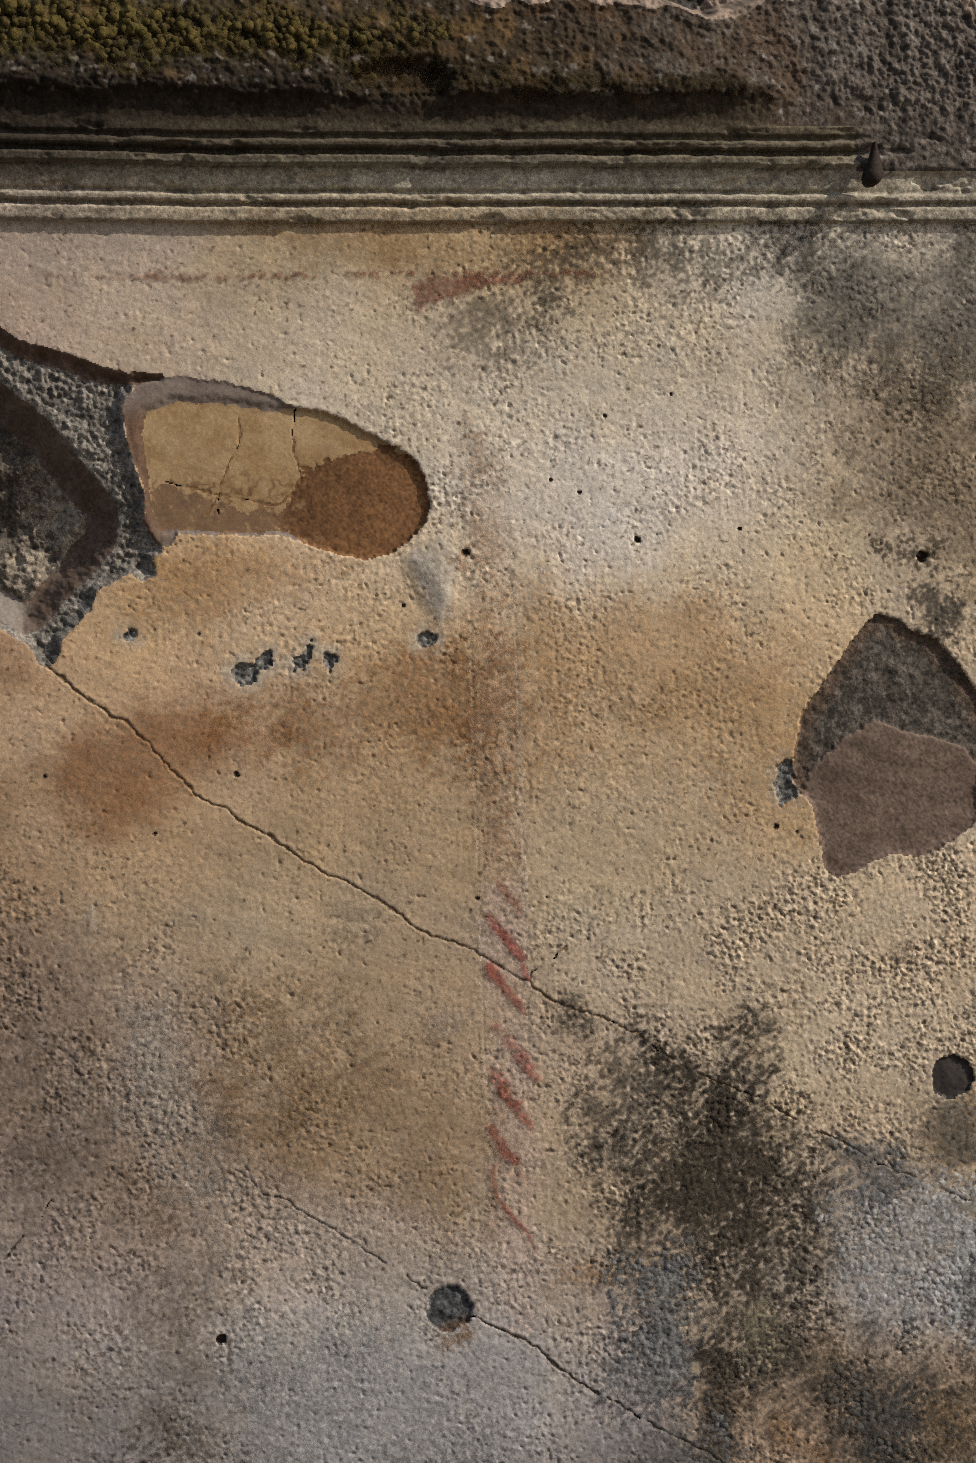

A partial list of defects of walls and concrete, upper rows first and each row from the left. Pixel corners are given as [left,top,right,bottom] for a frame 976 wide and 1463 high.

damp [783,211,976,415]
flaking render [0,326,430,667]
flaking render [231,649,273,687]
flaking render [292,639,338,673]
flaking render [416,631,437,648]
damp [872,533,976,644]
flaking render [773,614,976,878]
crack [44,665,851,1146]
crack [286,1199,425,1289]
damp [553,990,976,1463]
crack [478,1317,723,1463]